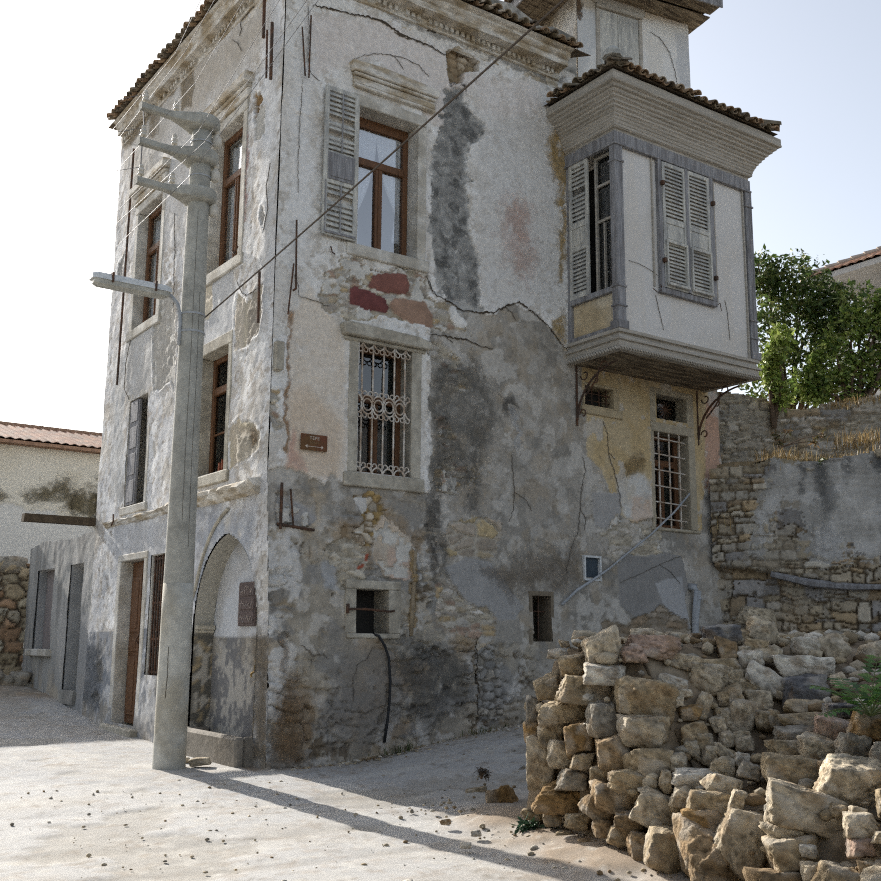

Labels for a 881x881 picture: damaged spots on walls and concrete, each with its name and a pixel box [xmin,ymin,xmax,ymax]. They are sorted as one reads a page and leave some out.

crack [298,4,446,193]
flaking render [317,254,468,368]
crack [426,276,568,351]
damp [25,481,97,518]
flaking render [275,488,319,527]
flaking render [324,490,414,590]